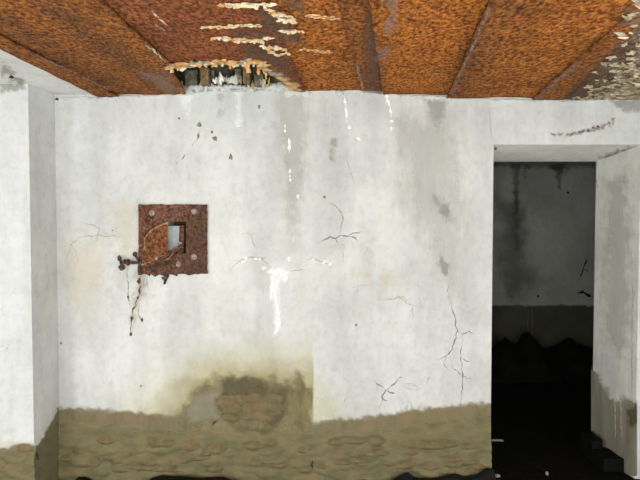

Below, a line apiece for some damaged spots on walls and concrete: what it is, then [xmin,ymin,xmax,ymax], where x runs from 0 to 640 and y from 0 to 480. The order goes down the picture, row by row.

peeling [163,58,302,92]
peeling [200,24,291,57]
peeling [217,2,305,35]
peeling [572,0,640,101]
crack [232,233,269,270]
crack [288,204,368,271]
water stain [493,163,596,291]
rust [126,269,149,336]
efflorescence [268,268,290,337]
crack [437,285,474,397]
water stain [0,367,492,480]
crack [373,377,429,410]